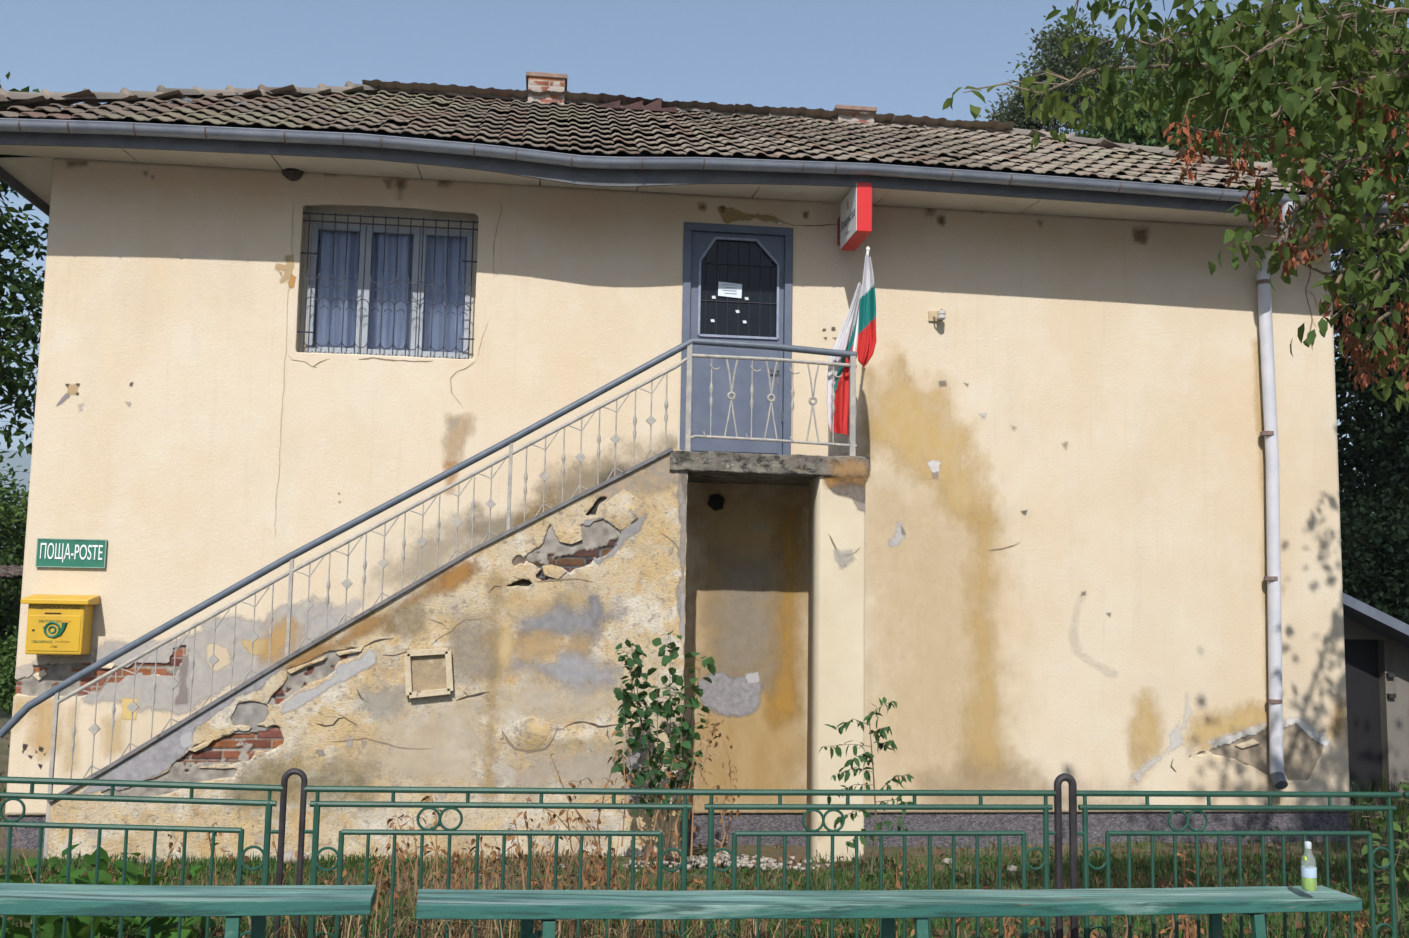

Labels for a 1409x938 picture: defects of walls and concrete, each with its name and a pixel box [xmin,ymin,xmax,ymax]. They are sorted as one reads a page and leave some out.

flaking render [512,496,646,581]
flaking render [826,476,866,511]
leakage [866,374,994,588]
peeling [15,598,376,797]
leakage [685,483,809,813]
leakage [939,680,1068,804]
leakage [1133,698,1330,781]
flaking render [1189,723,1323,781]